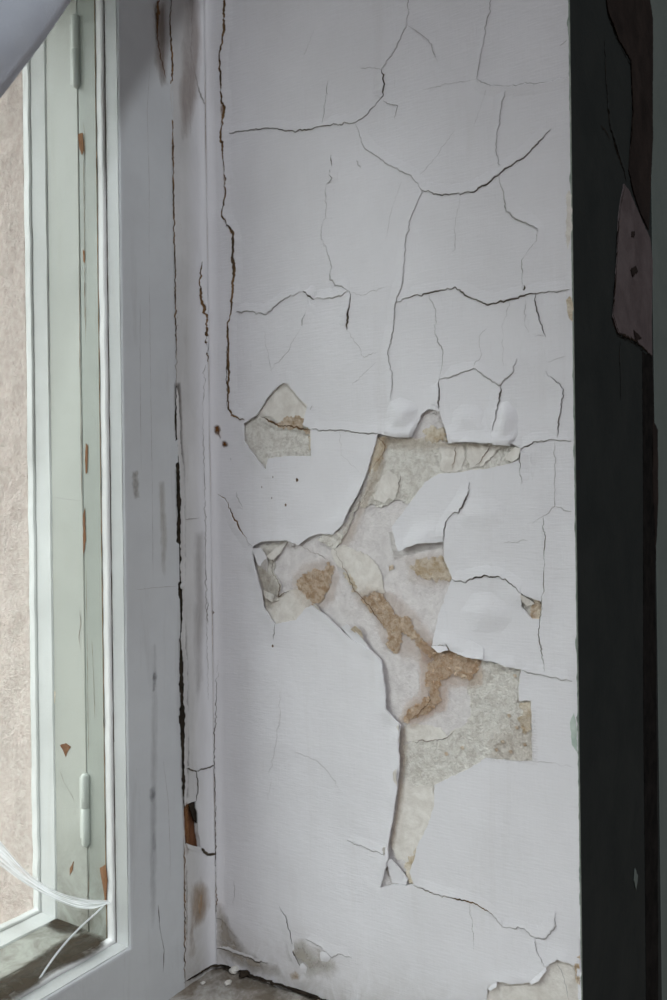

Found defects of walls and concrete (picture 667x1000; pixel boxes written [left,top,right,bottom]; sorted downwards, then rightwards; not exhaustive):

peeling [244,383,311,468]
crack [138,0,571,977]
peeling [606,0,659,1000]
peeling [251,409,538,887]
peeling [520,593,542,619]
flaking render [184,802,201,852]
peeling [487,955,580,1000]